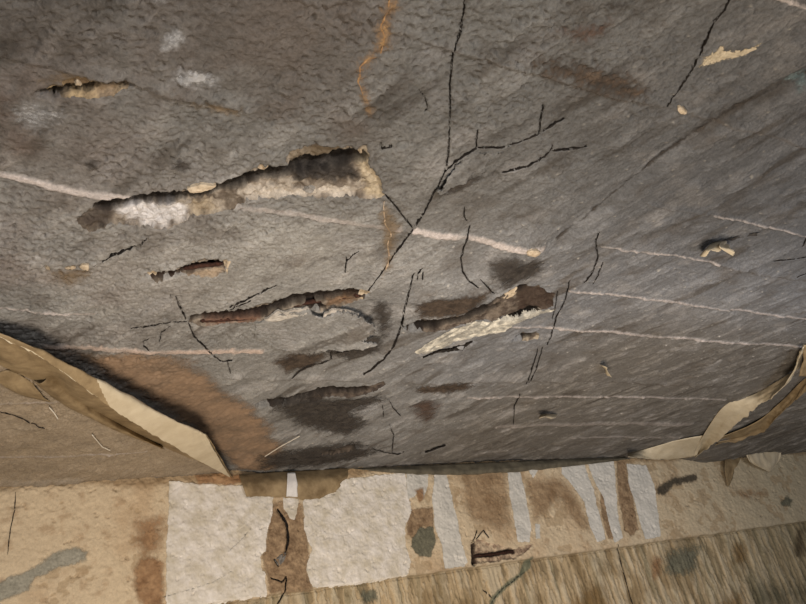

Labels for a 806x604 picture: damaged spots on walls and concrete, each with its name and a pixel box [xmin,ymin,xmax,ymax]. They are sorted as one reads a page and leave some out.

spalling [77,143,385,232]
crack [368,0,587,293]
crack [131,294,232,371]
spalling [147,258,231,283]
spalling [188,288,370,327]
crack [363,269,424,375]
crack [423,341,473,358]
spalling [406,284,556,354]
crack [513,232,603,425]
peeling [0,333,233,478]
water stain [257,388,383,469]
peeling [617,345,806,536]